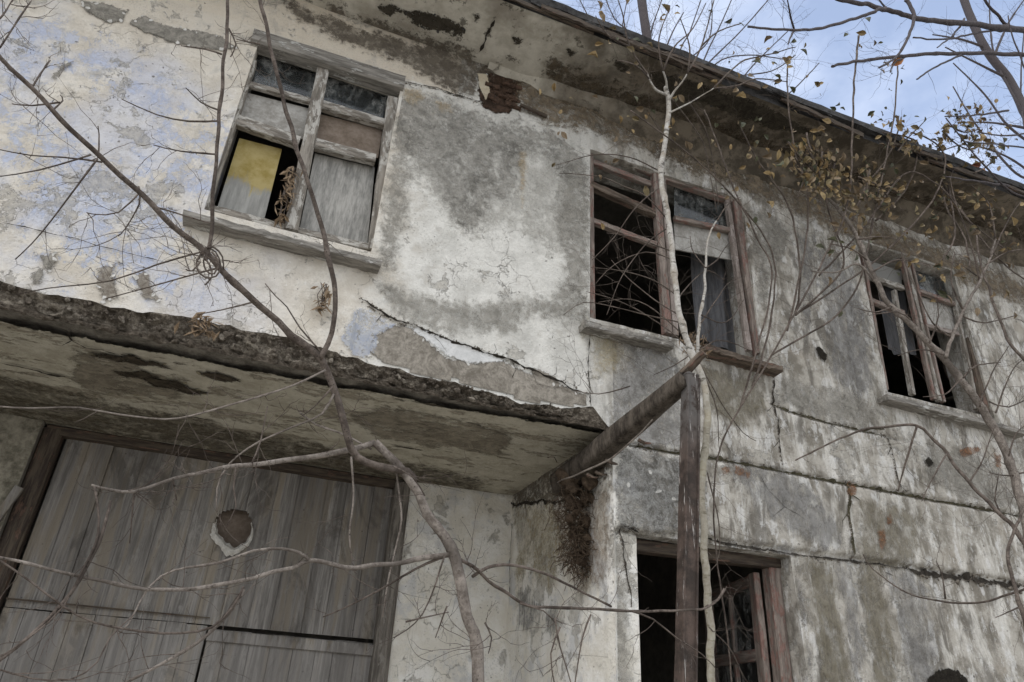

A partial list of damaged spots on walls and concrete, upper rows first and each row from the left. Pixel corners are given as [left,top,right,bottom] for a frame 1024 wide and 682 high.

flaking render [81,0,238,51]
peeling [376,3,480,37]
peeling [477,73,490,100]
water stain [283,0,1024,427]
spalling [0,251,678,430]
crack [359,297,591,404]
crack [629,379,1024,594]